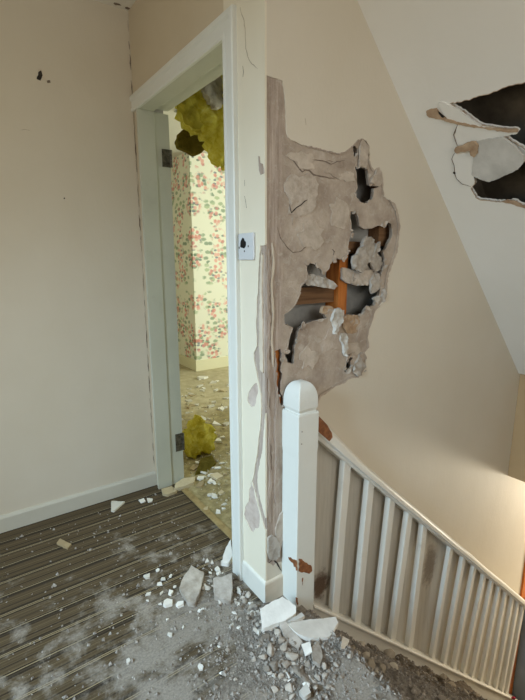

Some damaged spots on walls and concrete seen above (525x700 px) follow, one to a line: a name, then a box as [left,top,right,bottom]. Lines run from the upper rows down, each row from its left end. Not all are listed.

spalling [245,76,401,585]